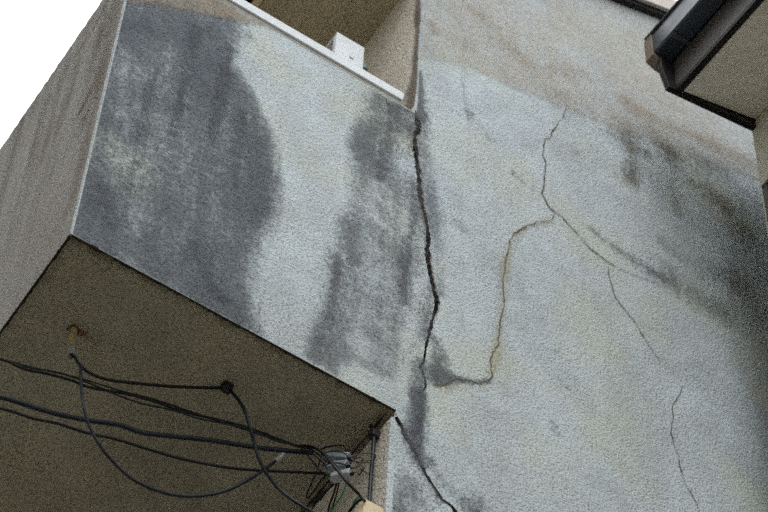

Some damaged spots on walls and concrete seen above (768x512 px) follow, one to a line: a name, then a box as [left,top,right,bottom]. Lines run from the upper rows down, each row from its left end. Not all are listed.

water stain [350,0,428,214]
water stain [603,54,755,175]
water stain [0,0,412,455]
crack [411,105,661,390]
crack [393,413,457,512]
crack [671,386,699,509]